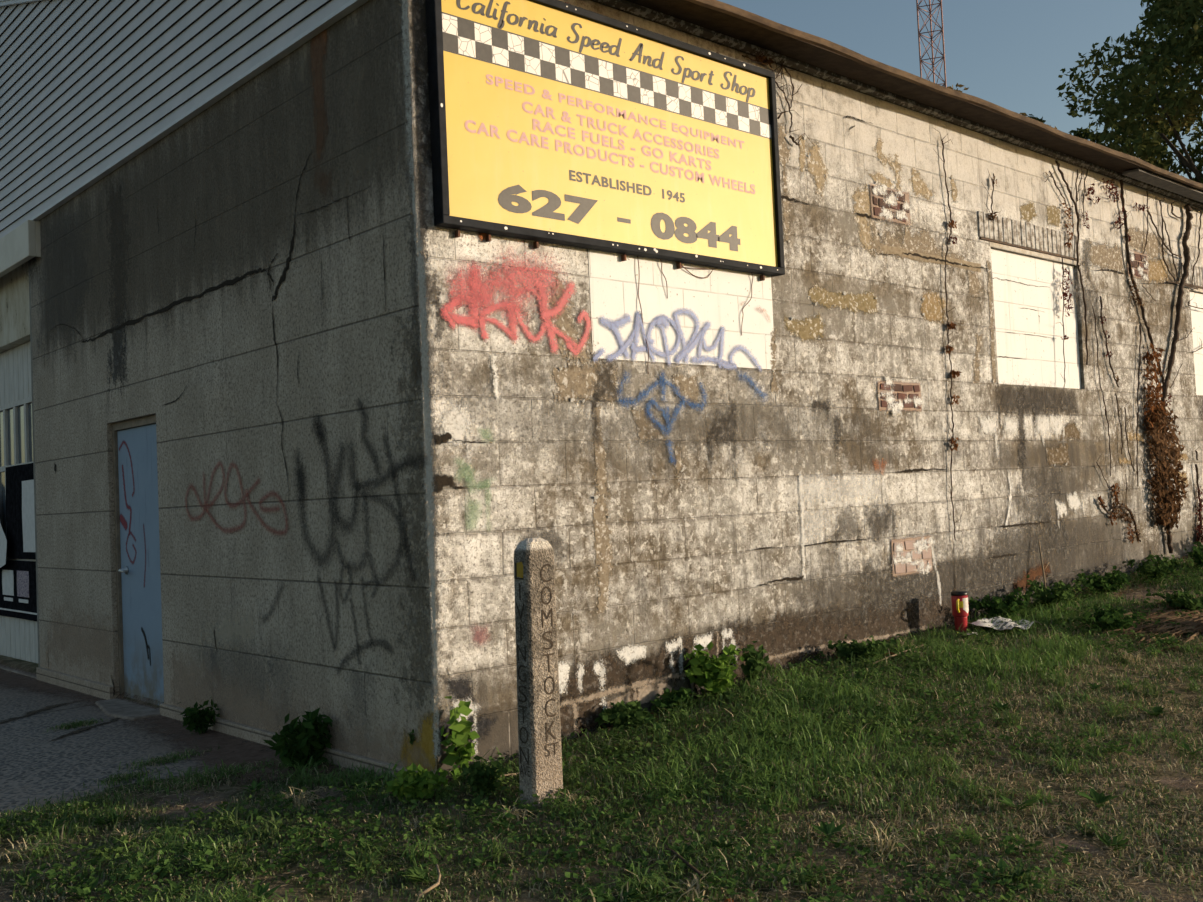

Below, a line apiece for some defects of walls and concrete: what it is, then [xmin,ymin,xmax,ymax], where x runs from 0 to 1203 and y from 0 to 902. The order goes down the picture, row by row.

peeling [852,138,997,384]
peeling [1088,224,1170,286]
crack [51,152,362,493]
damp [813,400,841,459]
flaking render [878,375,923,416]
damp [520,528,569,560]
damp [799,474,807,578]
damp [827,501,895,541]
flaking render [891,536,935,577]
damp [961,383,1080,597]
damp [560,547,971,737]
damp [438,674,498,753]